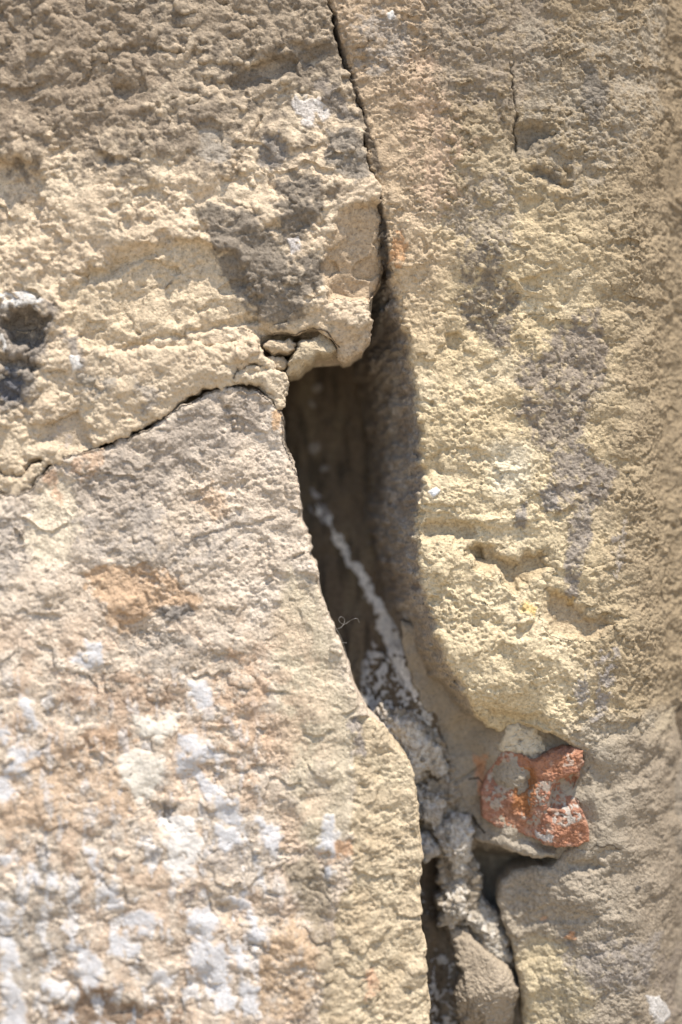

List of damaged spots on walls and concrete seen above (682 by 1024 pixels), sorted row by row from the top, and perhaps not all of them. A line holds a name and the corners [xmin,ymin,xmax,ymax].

crack [328,0,394,284]
crack [508,68,519,151]
crack [0,327,340,497]
crack [471,814,485,834]
crack [591,843,635,851]